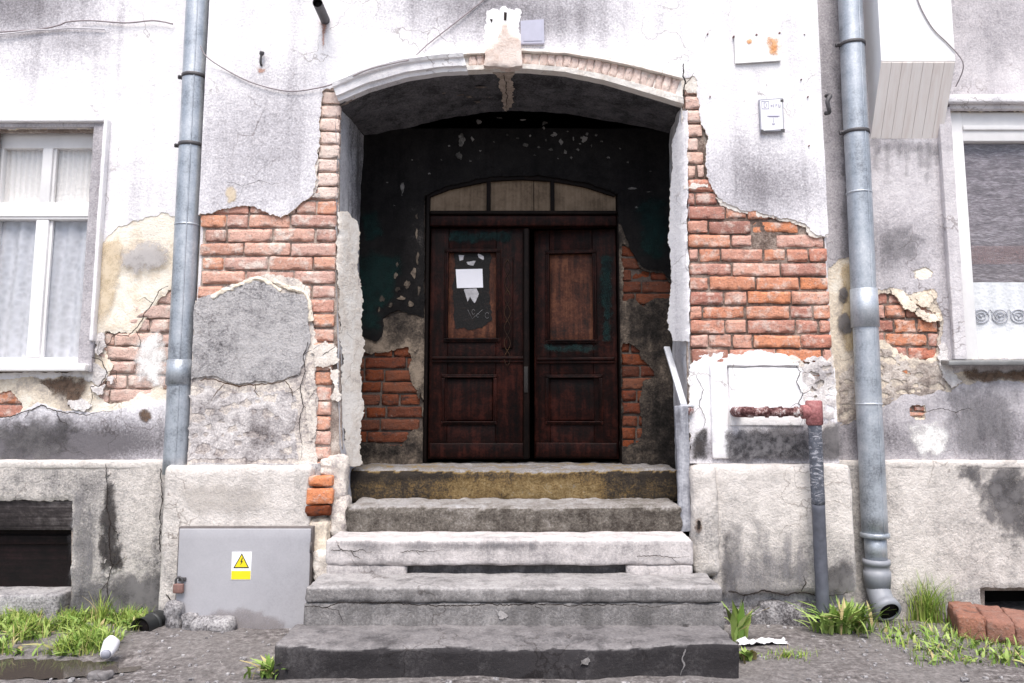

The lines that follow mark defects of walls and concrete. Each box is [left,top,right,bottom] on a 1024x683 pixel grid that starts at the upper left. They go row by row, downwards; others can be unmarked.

leakage [0,376,86,460]
flaking render [0,213,175,417]
crack [98,464,127,606]
flaking render [187,88,342,465]
crack [200,342,337,460]
flaking render [360,253,425,465]
flaking render [618,217,676,469]
leakage [725,424,809,463]
flaking render [681,76,856,431]
leakage [822,423,843,459]
flaking render [878,267,1024,420]
leakage [960,465,1024,536]